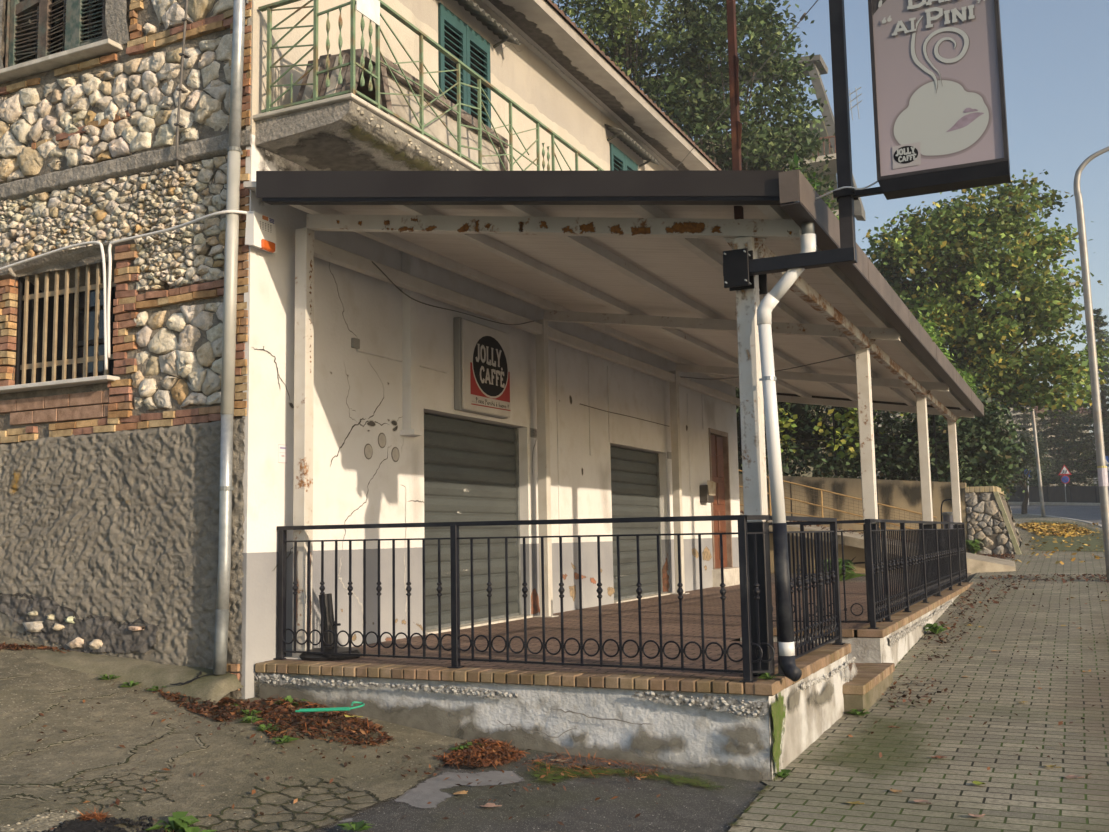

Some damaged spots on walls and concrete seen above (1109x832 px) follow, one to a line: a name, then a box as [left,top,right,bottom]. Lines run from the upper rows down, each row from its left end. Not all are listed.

corrosion [384,218,437,232]
corrosion [457,220,491,232]
corrosion [562,222,651,236]
corrosion [665,222,722,233]
crack [253,347,290,400]
crack [331,362,403,624]
crack [402,485,424,620]
peeling [0,593,159,653]
crack [0,673,135,758]
crack [170,671,227,685]
spalling [631,691,769,718]
crack [0,723,381,832]